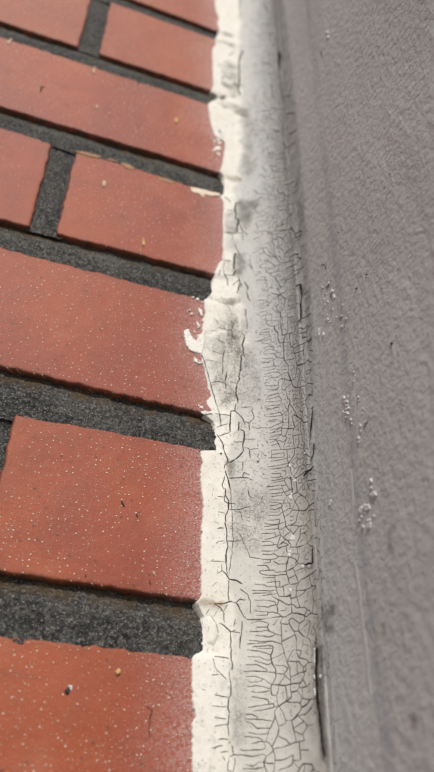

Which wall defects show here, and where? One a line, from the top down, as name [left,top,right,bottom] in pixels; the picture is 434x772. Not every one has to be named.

peeling [183,296,205,364]
crack [190,0,341,772]